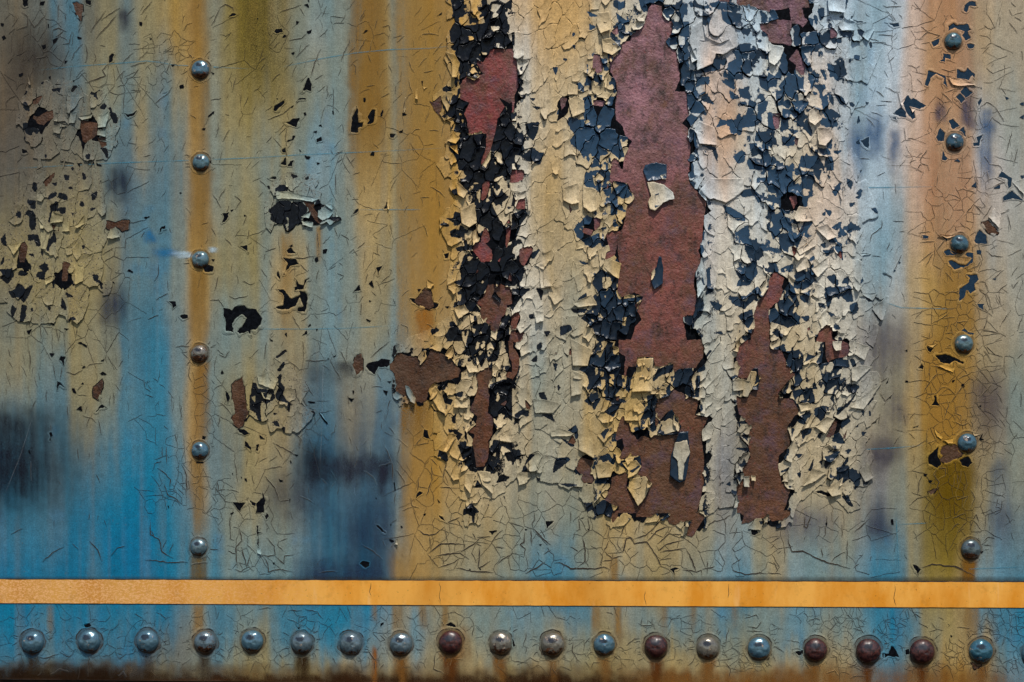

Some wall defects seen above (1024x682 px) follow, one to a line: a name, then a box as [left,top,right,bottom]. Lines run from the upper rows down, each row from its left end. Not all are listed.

peeling [0,73,138,334]
crack [0,0,449,575]
peeling [222,302,265,338]
peeling [264,77,359,335]
peeling [348,0,901,537]
crack [349,0,1024,596]
peeling [921,171,1024,311]
peeling [221,349,328,453]
corrosion [0,658,150,681]
corrosion [163,649,632,682]
crack [0,586,1024,681]
corrosion [647,662,983,682]